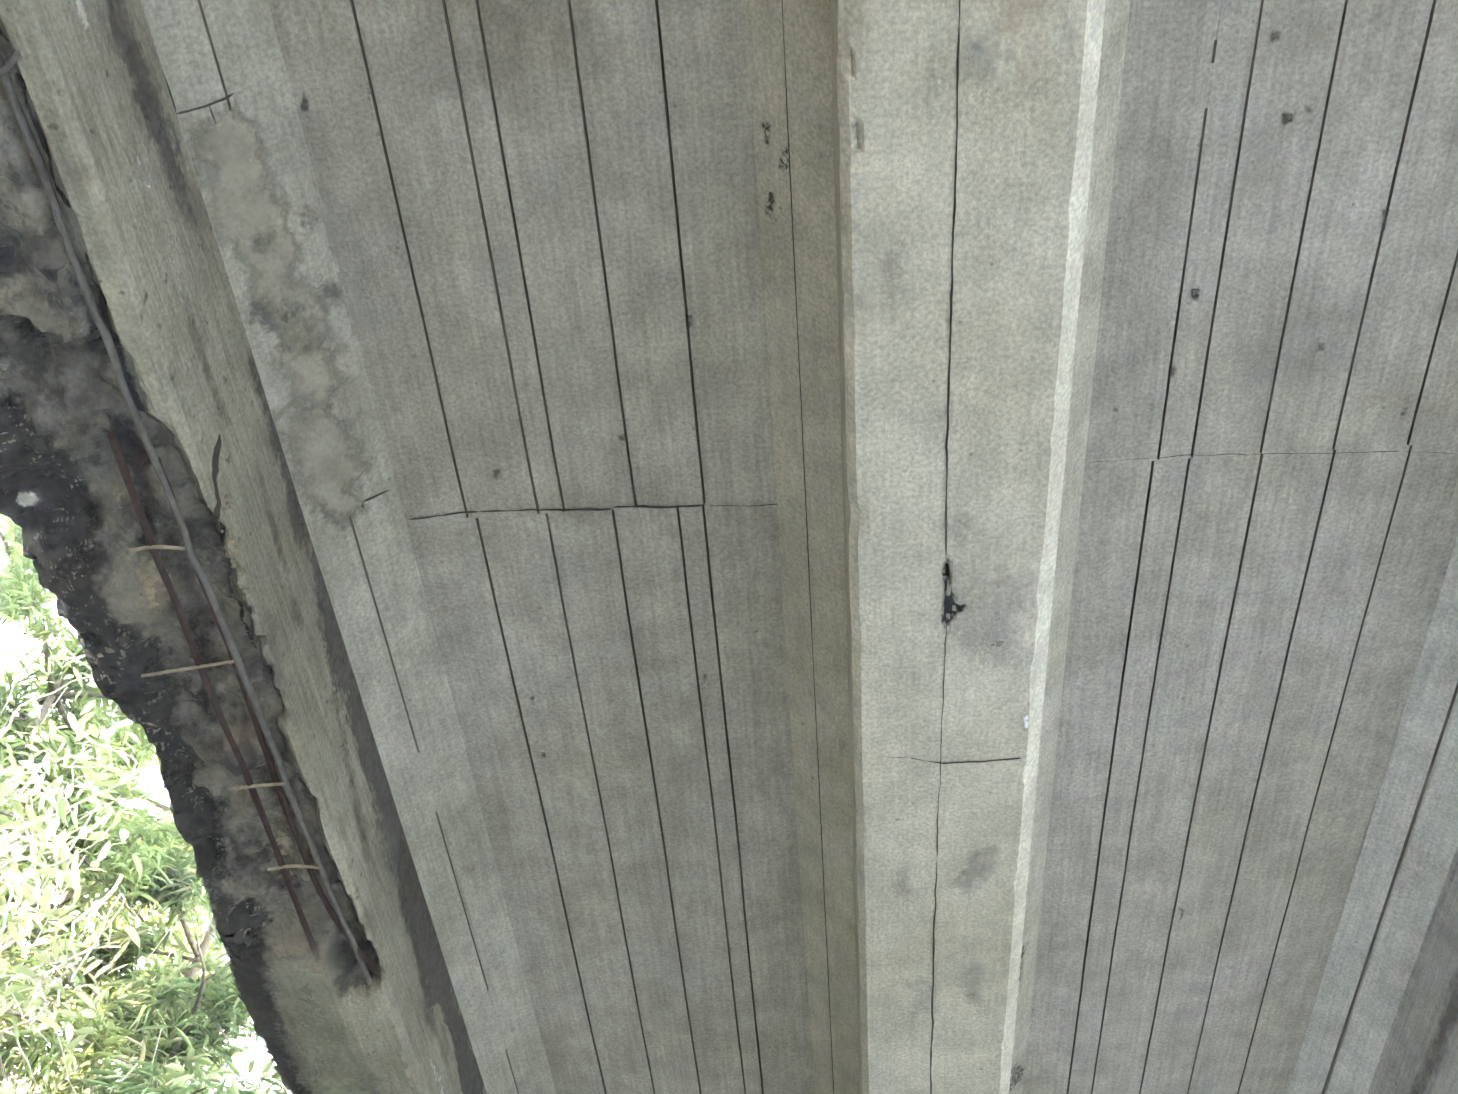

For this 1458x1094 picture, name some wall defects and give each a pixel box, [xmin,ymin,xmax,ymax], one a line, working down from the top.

spalling [0,51,381,996]
crack [945,0,961,555]
crack [881,623,1022,1094]